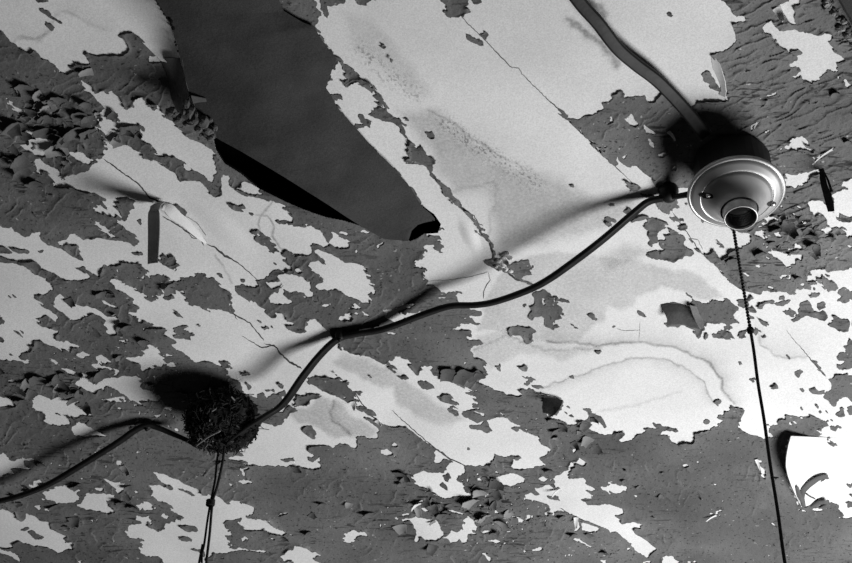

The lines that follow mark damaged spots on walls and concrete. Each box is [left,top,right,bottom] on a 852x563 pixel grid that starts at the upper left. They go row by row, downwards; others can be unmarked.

crack [104,159,256,279]
crack [229,312,302,369]
peeling [0,0,534,338]
peeling [0,247,852,563]
crack [461,16,632,183]
peeling [558,0,852,340]